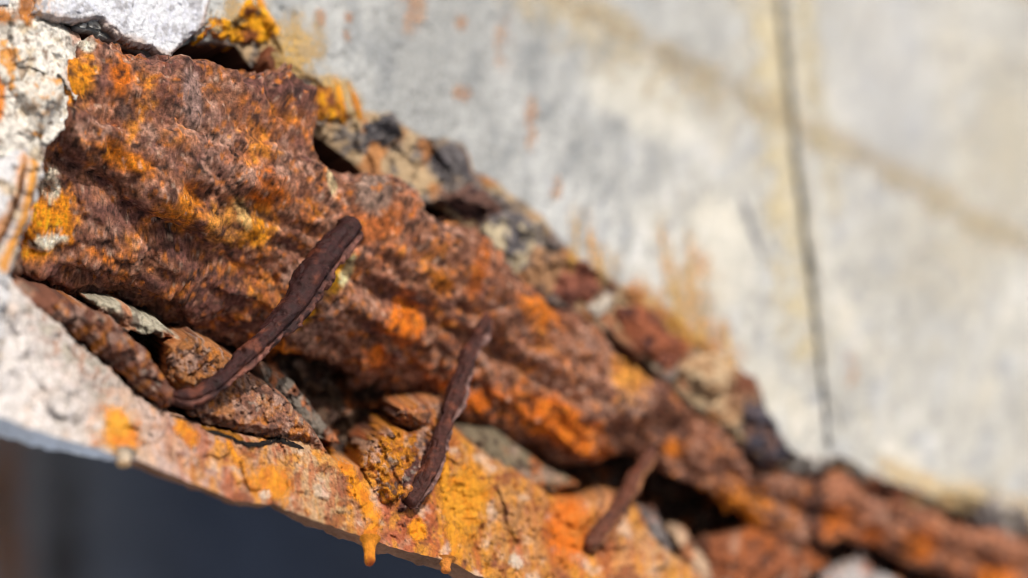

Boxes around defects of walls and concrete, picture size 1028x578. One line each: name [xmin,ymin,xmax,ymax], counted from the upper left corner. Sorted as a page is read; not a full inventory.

rust [0,0,34,24]
spalling [0,0,210,163]
rust [190,0,362,127]
spalling [348,112,403,154]
spalling [429,141,502,236]
crack [765,0,842,450]
rust [98,405,142,468]
spalling [0,233,953,578]
rust [325,445,381,567]
rust [409,519,426,541]
rust [439,453,488,574]
rust [544,488,591,563]